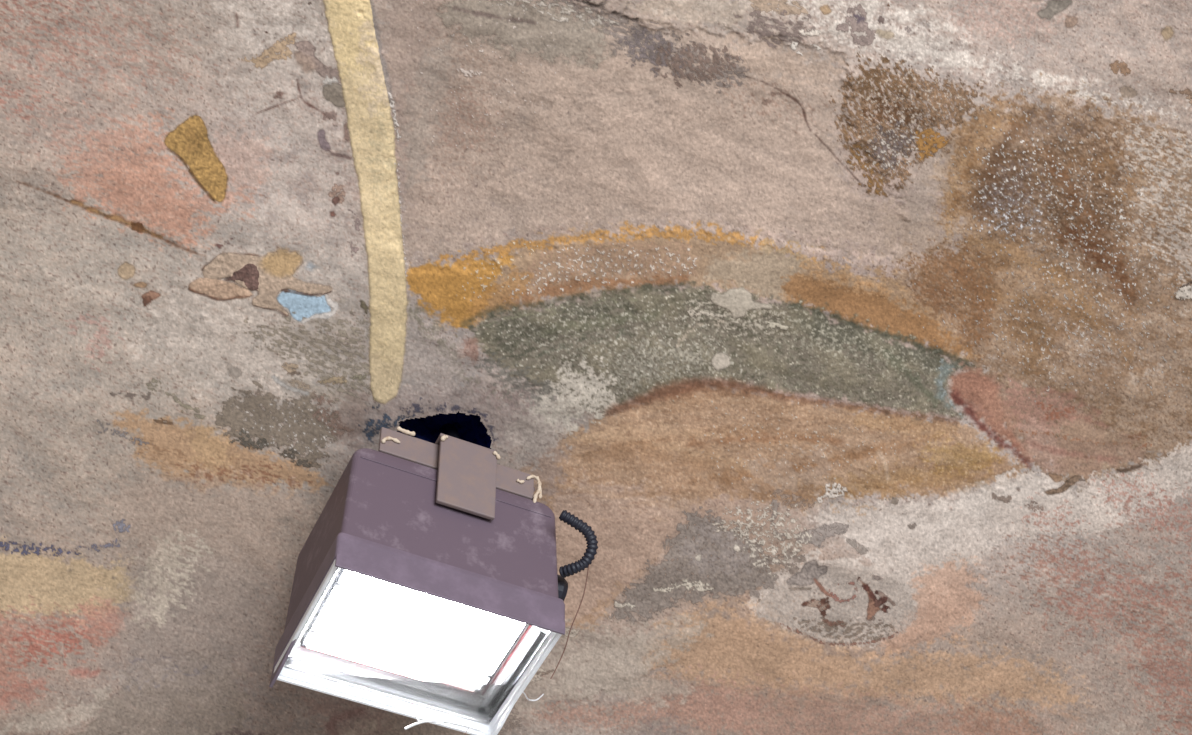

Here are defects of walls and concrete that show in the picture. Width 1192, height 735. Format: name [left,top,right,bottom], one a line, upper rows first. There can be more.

crack [577,0,638,21]
water stain [734,10,816,48]
water stain [436,0,749,148]
flaking render [188,249,338,323]
water stain [462,238,697,301]
water stain [943,99,1192,400]
water stain [147,308,423,468]
spalling [397,411,492,449]
peeling [815,483,847,503]
peeling [653,579,714,592]
water stain [609,489,868,624]
spalling [712,500,898,646]